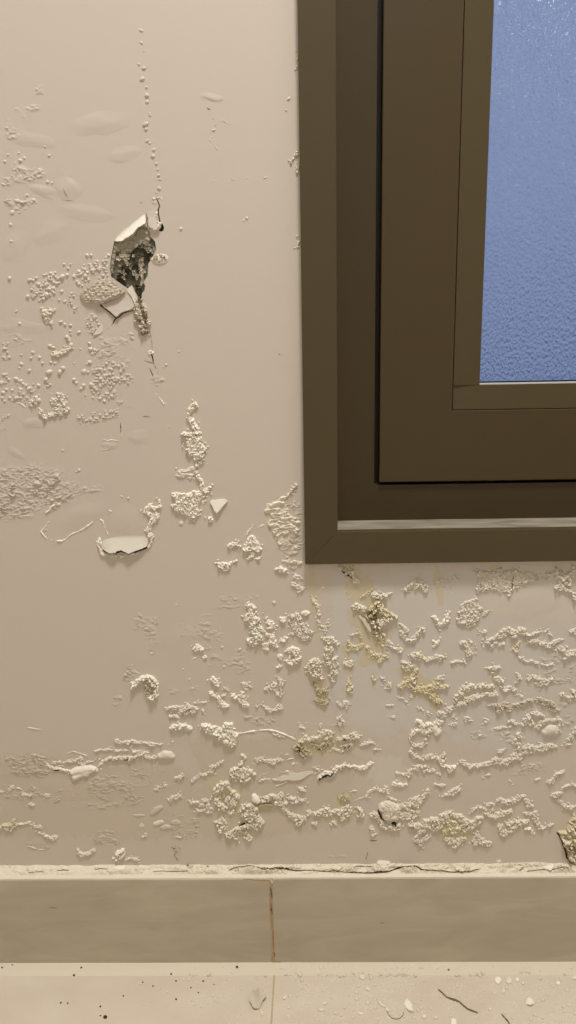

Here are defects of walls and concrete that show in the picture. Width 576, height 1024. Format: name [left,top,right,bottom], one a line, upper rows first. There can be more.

spalling [79,197,168,337]
crack [92,304,131,335]
peeling [40,503,154,558]
spalling [202,495,228,524]
water stain [0,482,576,857]
crack [230,810,479,873]
spalling [557,813,576,864]